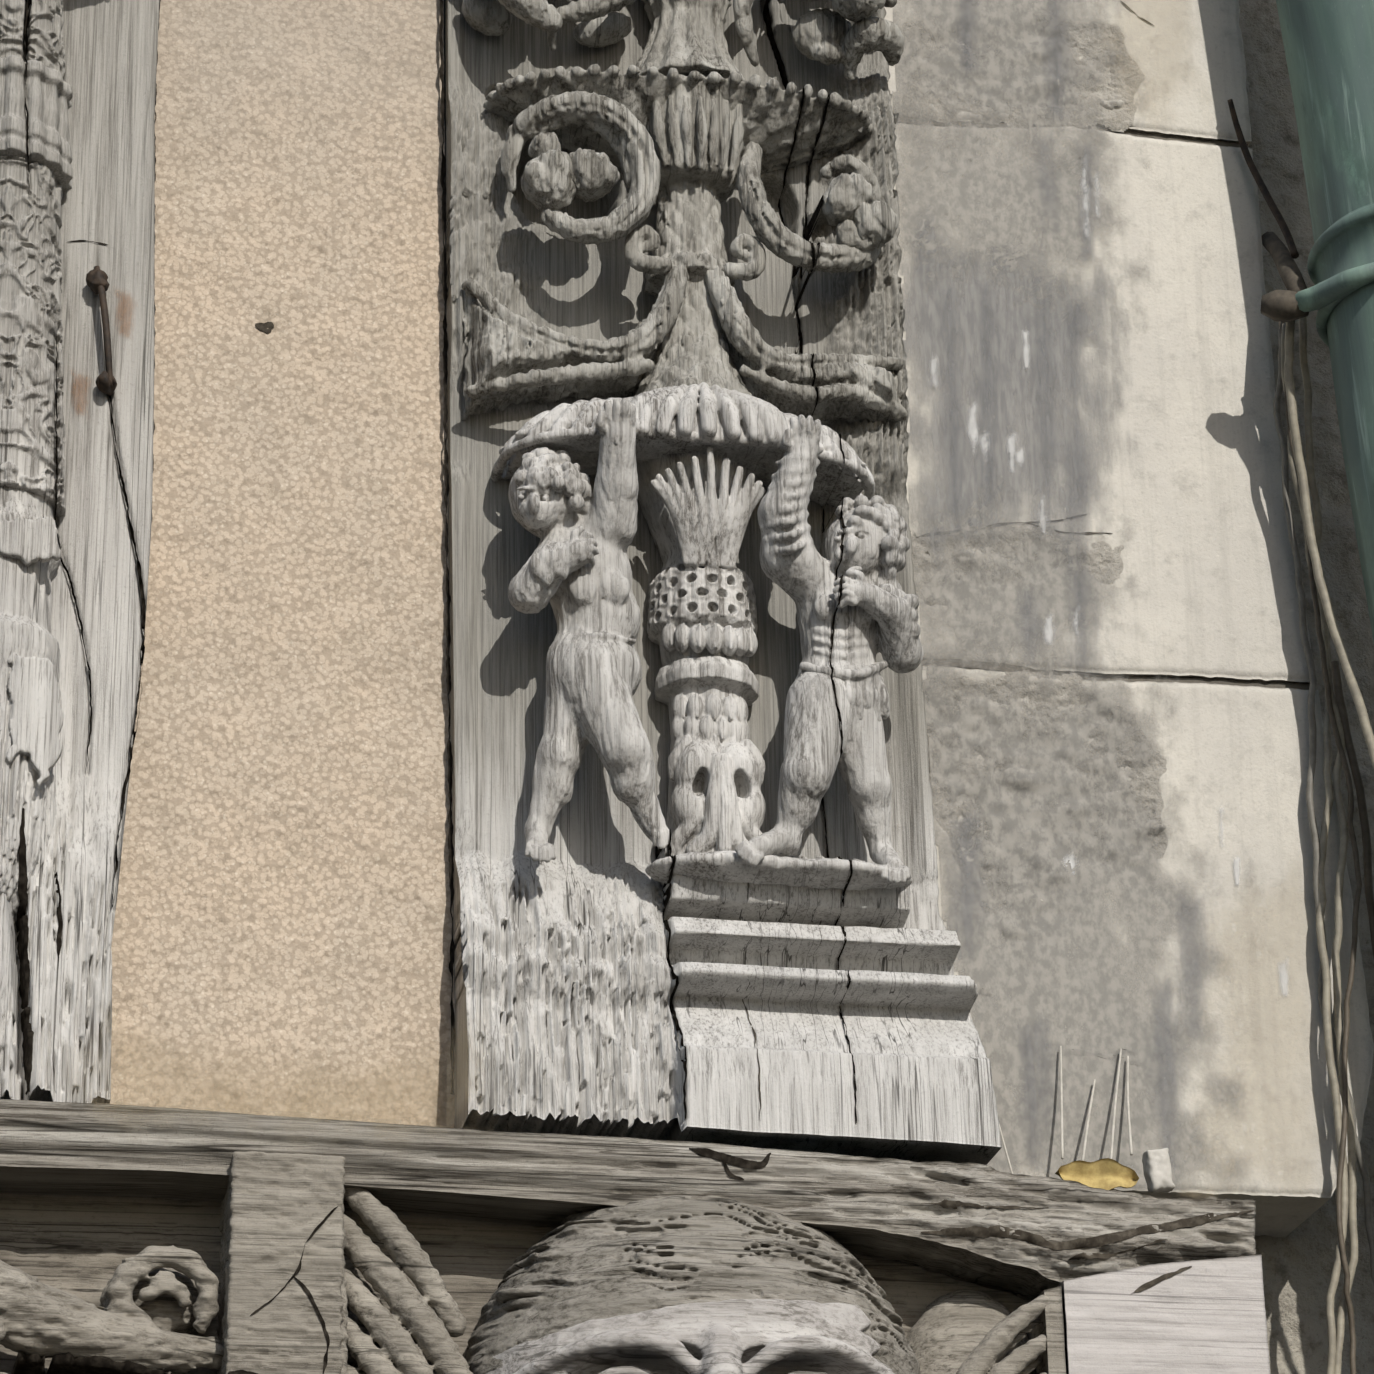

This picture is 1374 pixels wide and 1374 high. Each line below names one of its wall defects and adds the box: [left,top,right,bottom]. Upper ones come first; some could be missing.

crack [763,0,830,416]
water stain [892,0,1117,688]
spalling [901,17,1145,132]
crack [16,808,63,1095]
crack [822,434,847,760]
crack [821,798,857,1124]
spalling [927,724,1009,912]
spalling [938,666,1095,737]
water stain [922,643,1209,1190]
spalling [1077,706,1168,859]
crack [11,1352,173,1374]
crack [250,1206,338,1374]